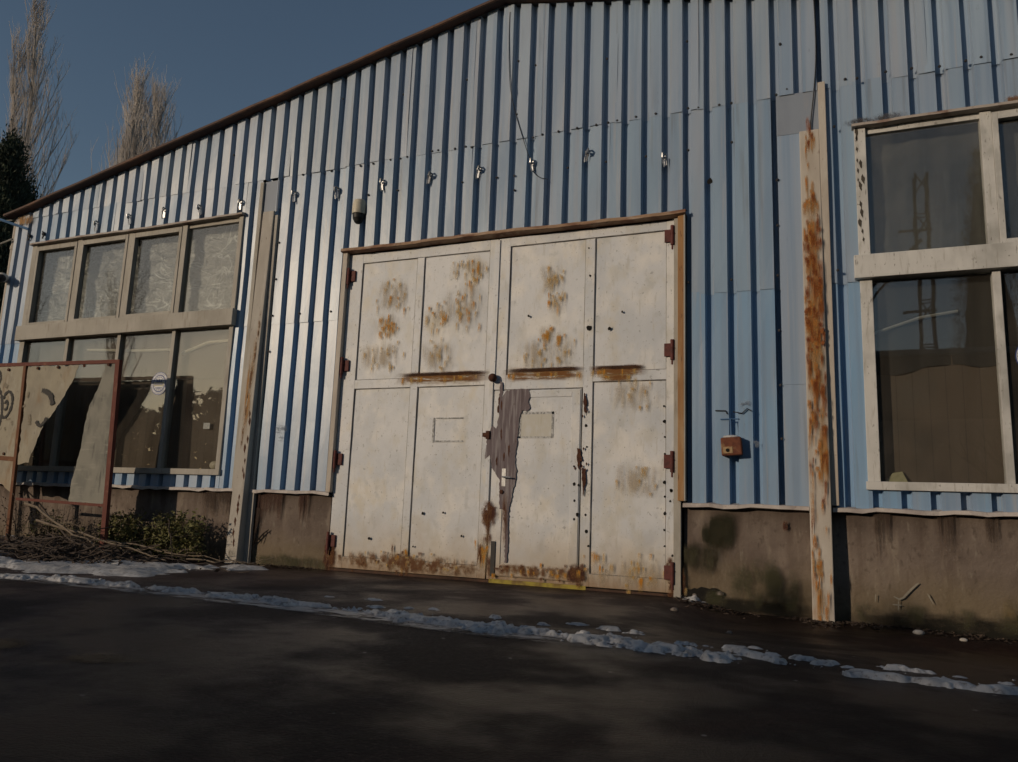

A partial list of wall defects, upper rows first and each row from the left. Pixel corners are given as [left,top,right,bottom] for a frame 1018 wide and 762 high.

rust [364,278,408,370]
rust [402,260,487,383]
rust [508,327,651,397]
rust [803,118,832,621]
rust [323,502,613,587]
water stain [685,514,735,571]
water stain [707,571,804,618]